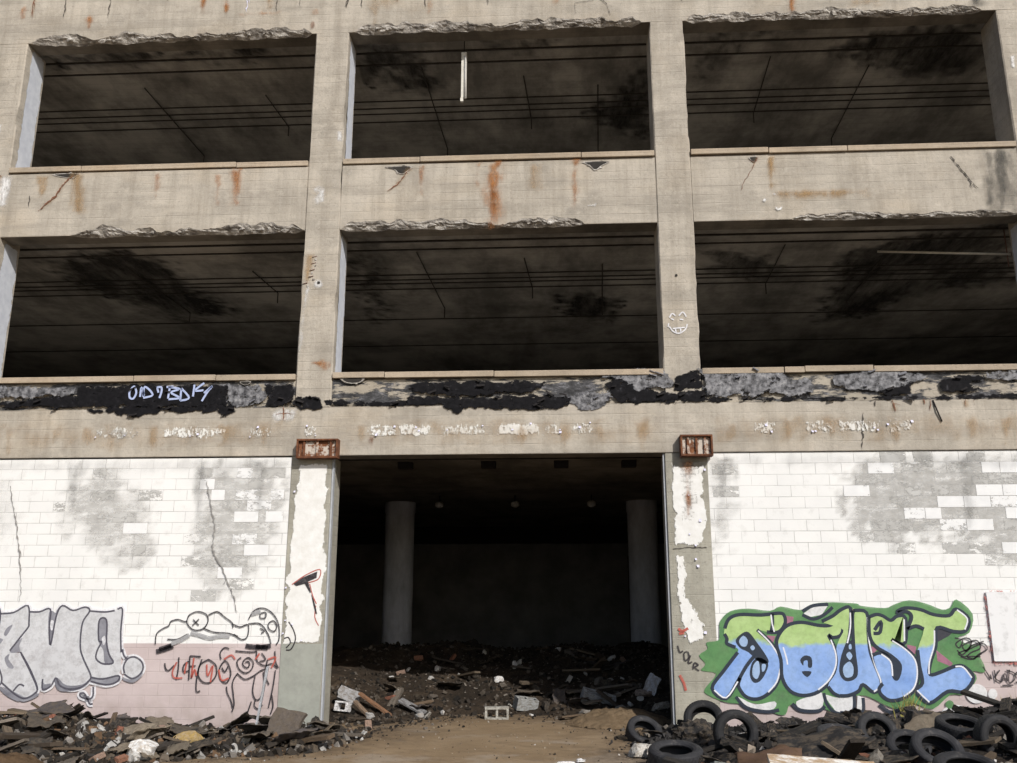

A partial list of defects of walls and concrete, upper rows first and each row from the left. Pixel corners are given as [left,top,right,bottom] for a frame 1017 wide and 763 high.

spalling [345,16,639,159]
damp [53,249,237,318]
spalling [335,216,582,384]
peeling [0,244,1017,437]
spalling [794,209,1017,281]
peeling [164,426,226,439]
crack [10,486,22,600]
crack [206,482,237,612]
peeling [181,463,328,644]
peeling [671,460,739,643]